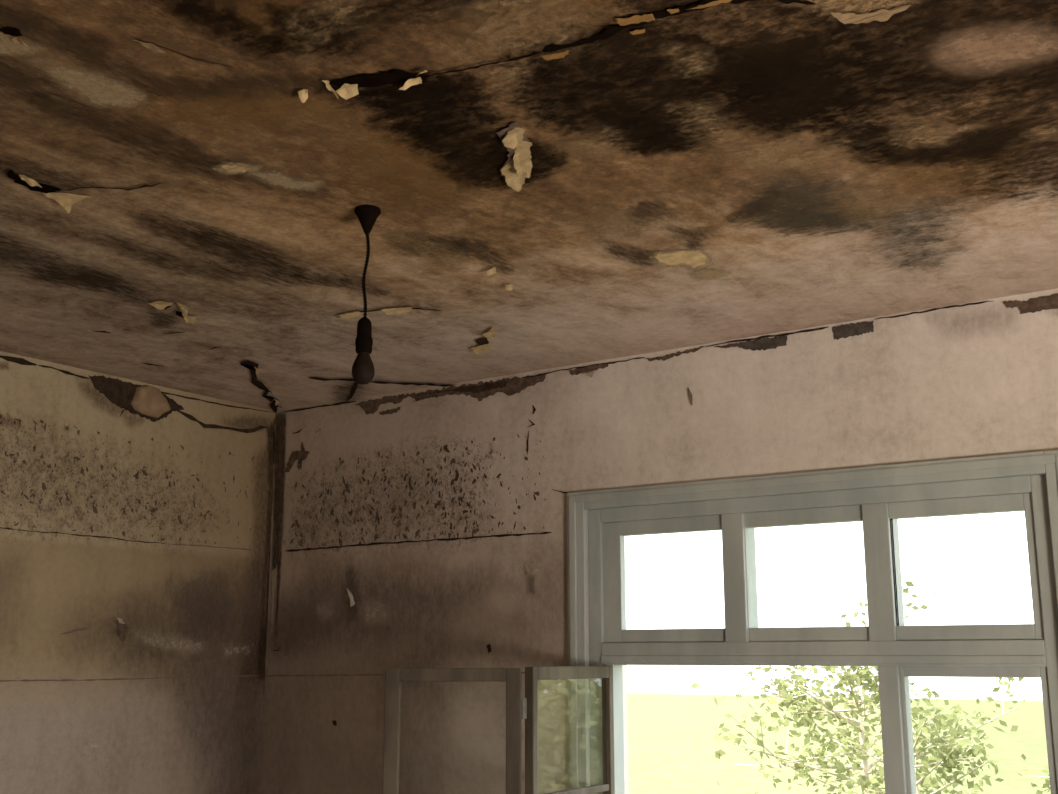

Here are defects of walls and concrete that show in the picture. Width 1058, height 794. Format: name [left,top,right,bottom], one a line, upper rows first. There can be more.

peeling [801,0,911,24]
crack [298,0,816,103]
peeling [496,122,533,192]
water stain [0,0,1058,268]
water stain [193,227,385,296]
crack [240,360,282,413]
flaking render [0,293,1058,433]